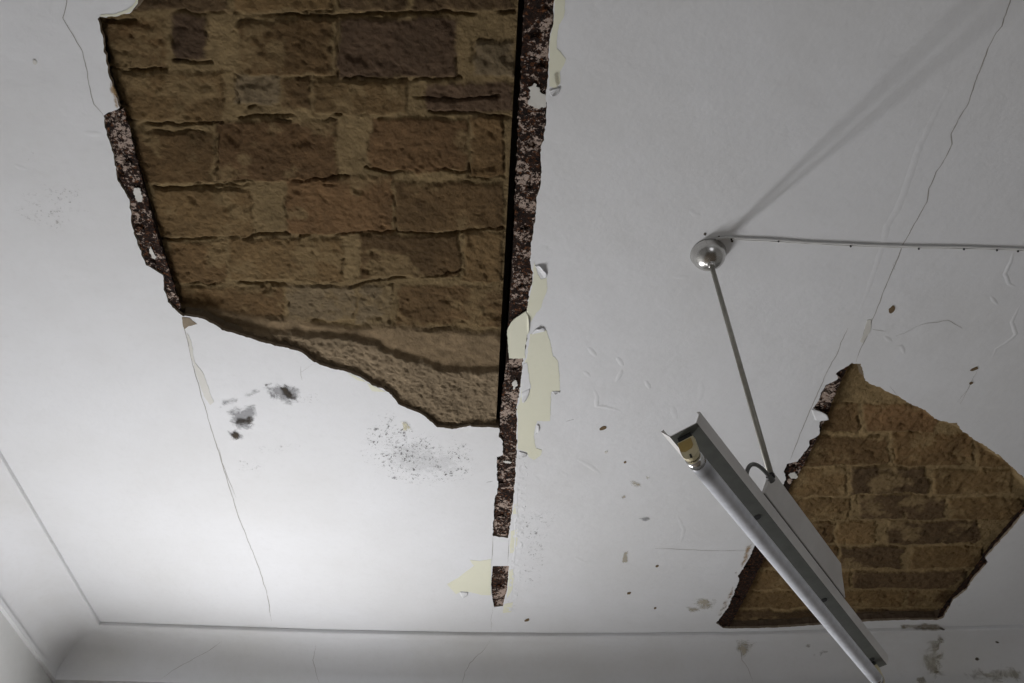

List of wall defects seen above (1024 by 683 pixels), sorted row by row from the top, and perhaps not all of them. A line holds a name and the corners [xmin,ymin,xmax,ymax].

crack [63,0,104,116]
spalling [99,0,560,460]
crack [792,0,1011,454]
crack [184,329,271,616]
mould [224,402,254,439]
mould [266,385,296,400]
spalling [788,363,1024,630]
peeling [447,559,491,598]
peeling [503,569,514,613]
spalling [730,558,820,626]